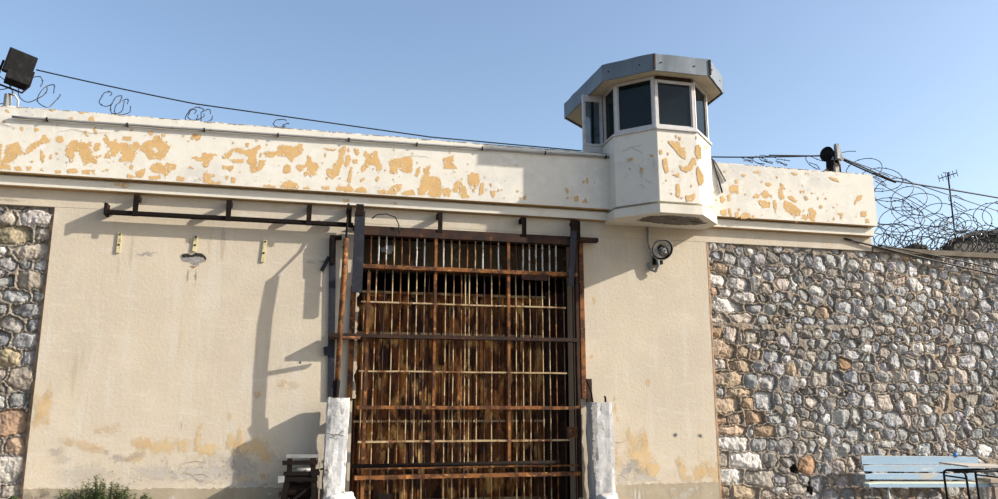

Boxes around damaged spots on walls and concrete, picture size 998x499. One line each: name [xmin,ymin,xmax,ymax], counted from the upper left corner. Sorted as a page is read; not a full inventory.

peeling [0,109,502,205]
peeling [649,135,708,202]
peeling [709,166,843,223]
flaking render [181,253,207,268]
damp [133,412,277,486]
damp [623,431,661,499]